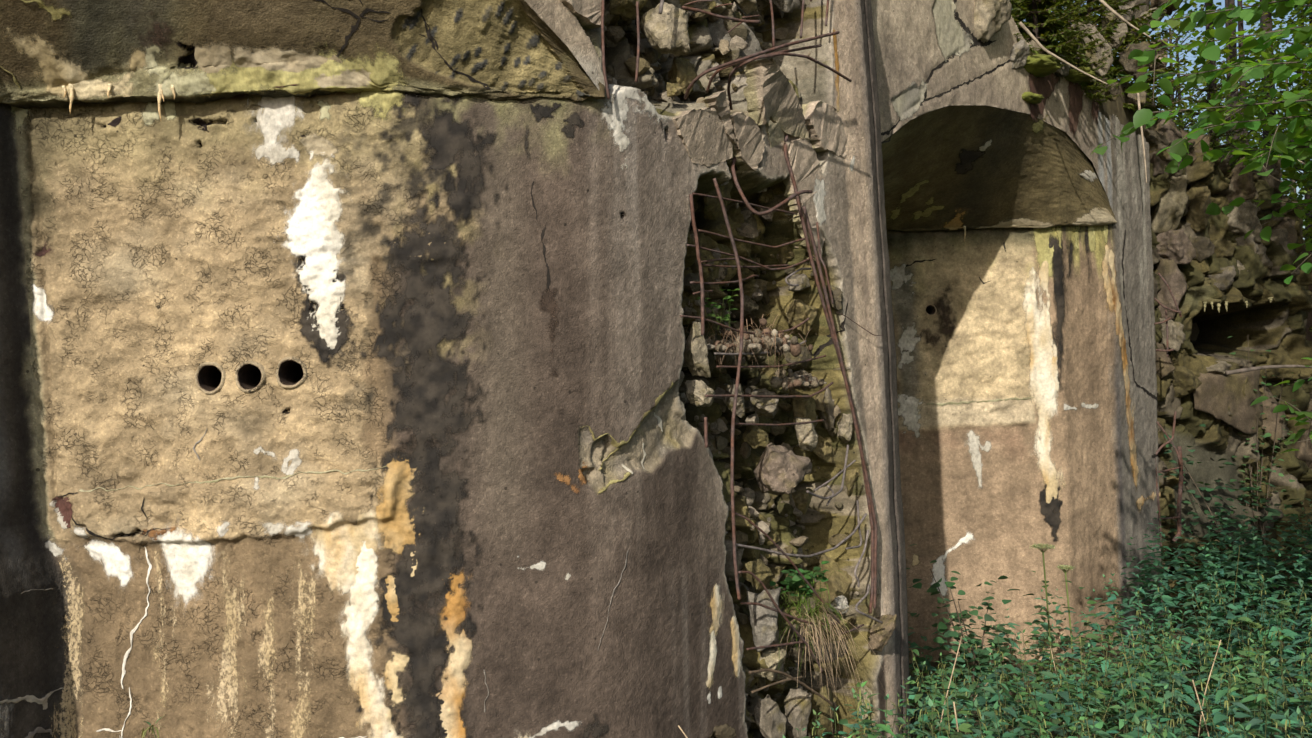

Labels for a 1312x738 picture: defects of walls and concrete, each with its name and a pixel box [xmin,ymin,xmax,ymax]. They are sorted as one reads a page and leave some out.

crack [316,0,490,89]
crack [881,0,1010,144]
damp [890,180,966,231]
damp [540,288,558,352]
damp [898,286,956,369]
damp [3,27,499,738]
damp [898,394,922,438]
damp [979,207,1117,542]
crack [58,429,387,738]
rust [436,573,472,738]
crack [0,688,62,738]
damp [524,714,609,738]